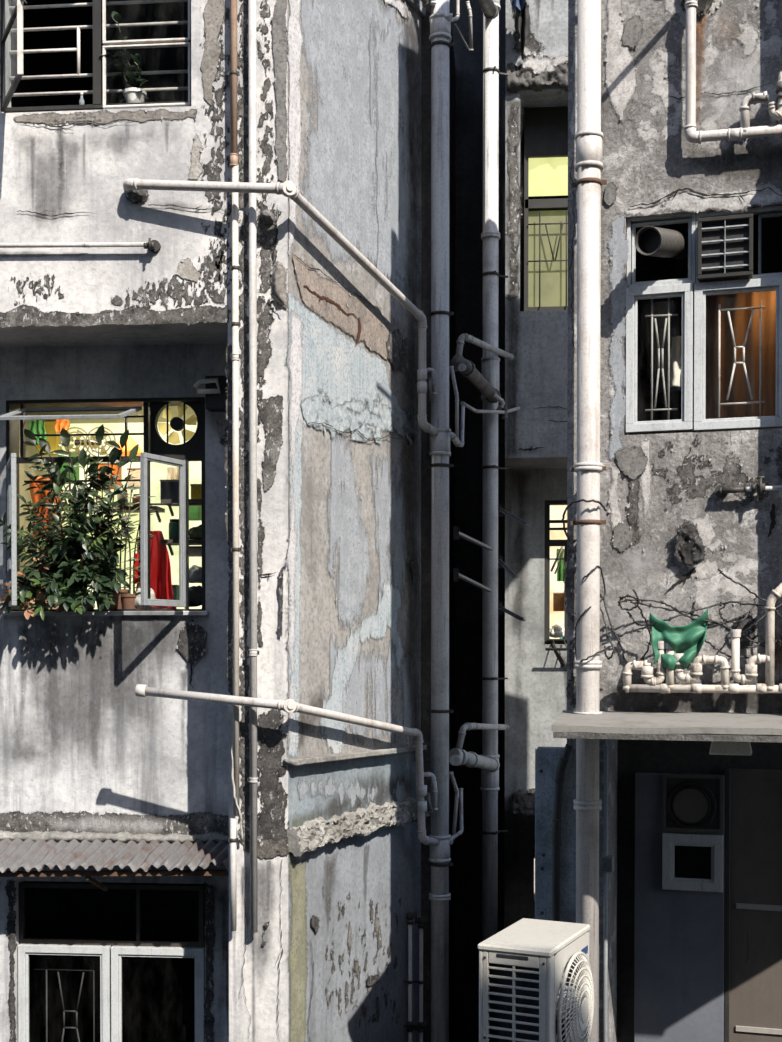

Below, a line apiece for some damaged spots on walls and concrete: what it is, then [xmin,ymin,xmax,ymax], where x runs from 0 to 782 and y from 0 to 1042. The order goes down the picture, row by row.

peeling [513,0,578,138]
peeling [605,0,782,153]
crack [630,187,782,207]
peeling [604,182,782,650]
peeling [0,0,422,1042]
crack [666,568,695,592]
crack [768,504,776,537]
leakage [22,618,192,744]